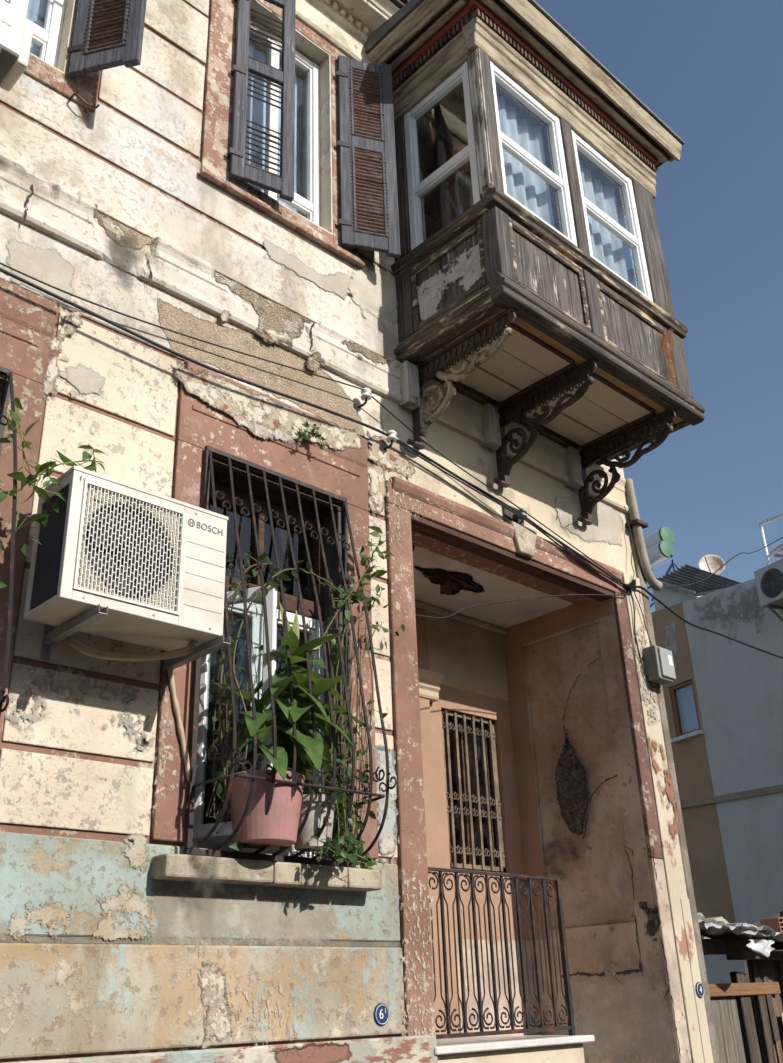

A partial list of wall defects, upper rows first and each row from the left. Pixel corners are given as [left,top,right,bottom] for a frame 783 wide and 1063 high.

crack [24,184,38,222]
flaking render [0,239,105,401]
leakage [111,237,135,270]
flaking render [263,239,398,324]
peeling [417,244,482,320]
flaking render [156,298,432,545]
flaking render [555,495,624,546]
peeling [375,745,400,862]
crack [579,775,617,841]
flaking render [122,833,152,872]
crack [561,843,681,1056]
spalling [639,901,661,941]